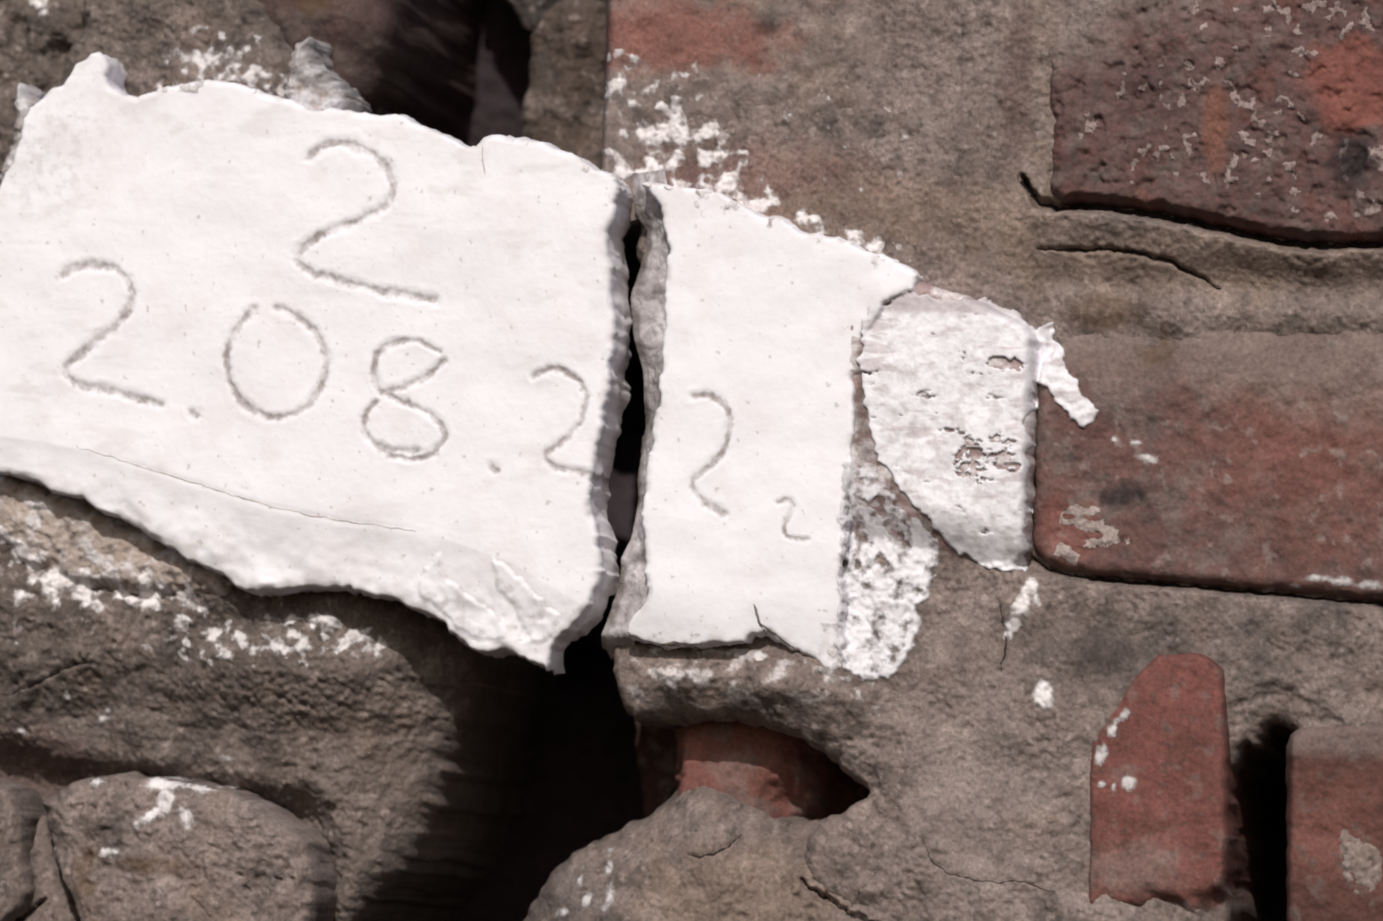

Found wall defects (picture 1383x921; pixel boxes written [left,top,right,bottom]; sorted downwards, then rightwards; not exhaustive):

crack [1017,176,1383,250]
crack [1037,247,1221,290]
crack [601,170,670,719]
peeling [834,288,1099,680]
spalling [1054,504,1130,565]